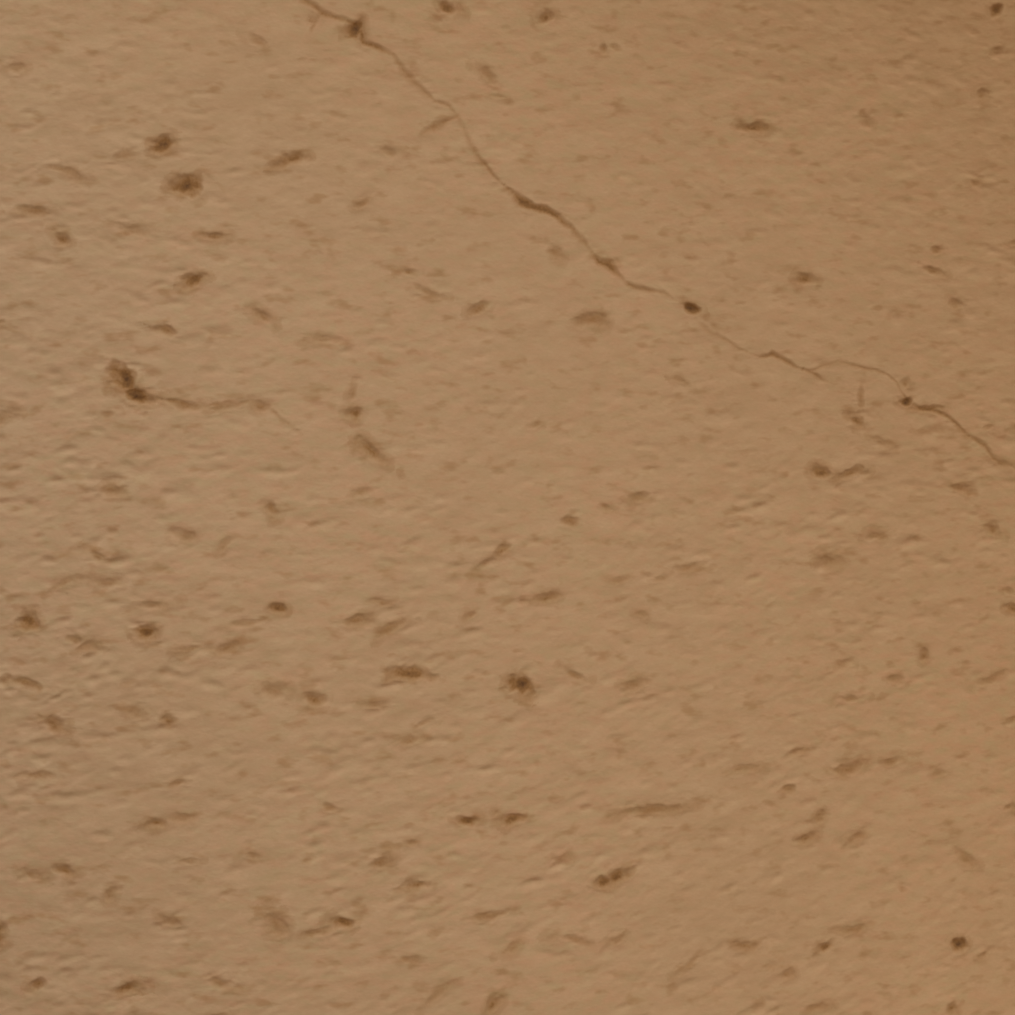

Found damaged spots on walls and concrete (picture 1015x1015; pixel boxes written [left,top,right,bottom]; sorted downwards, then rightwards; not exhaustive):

crack [138,388,308,441]
crack [293,0,1015,480]